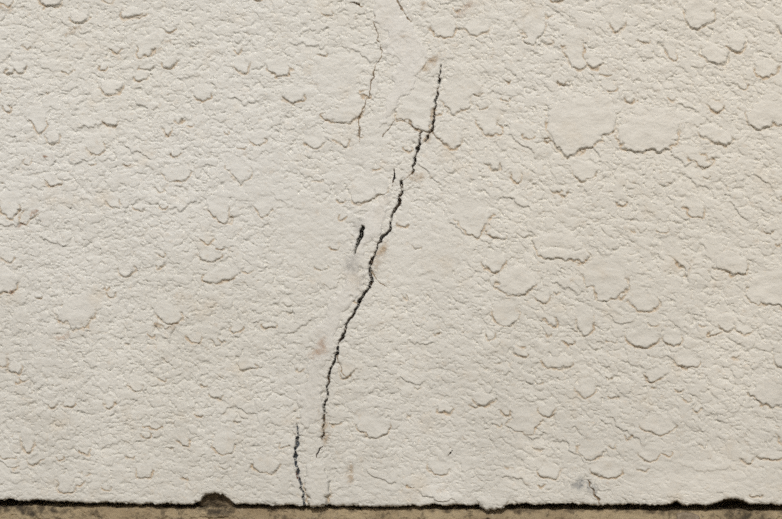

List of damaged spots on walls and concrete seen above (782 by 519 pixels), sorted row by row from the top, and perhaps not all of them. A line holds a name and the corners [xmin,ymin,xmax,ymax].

crack [349,2,383,142]
crack [293,66,448,505]